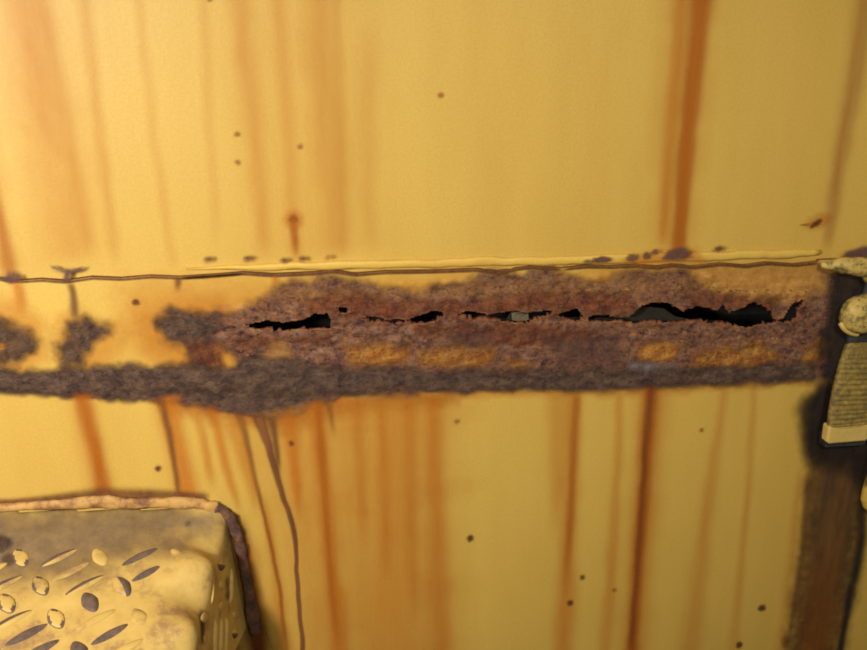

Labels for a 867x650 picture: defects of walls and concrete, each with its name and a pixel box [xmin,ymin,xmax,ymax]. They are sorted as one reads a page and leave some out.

corrosion [844,246,867,257]
corrosion [0,265,867,650]